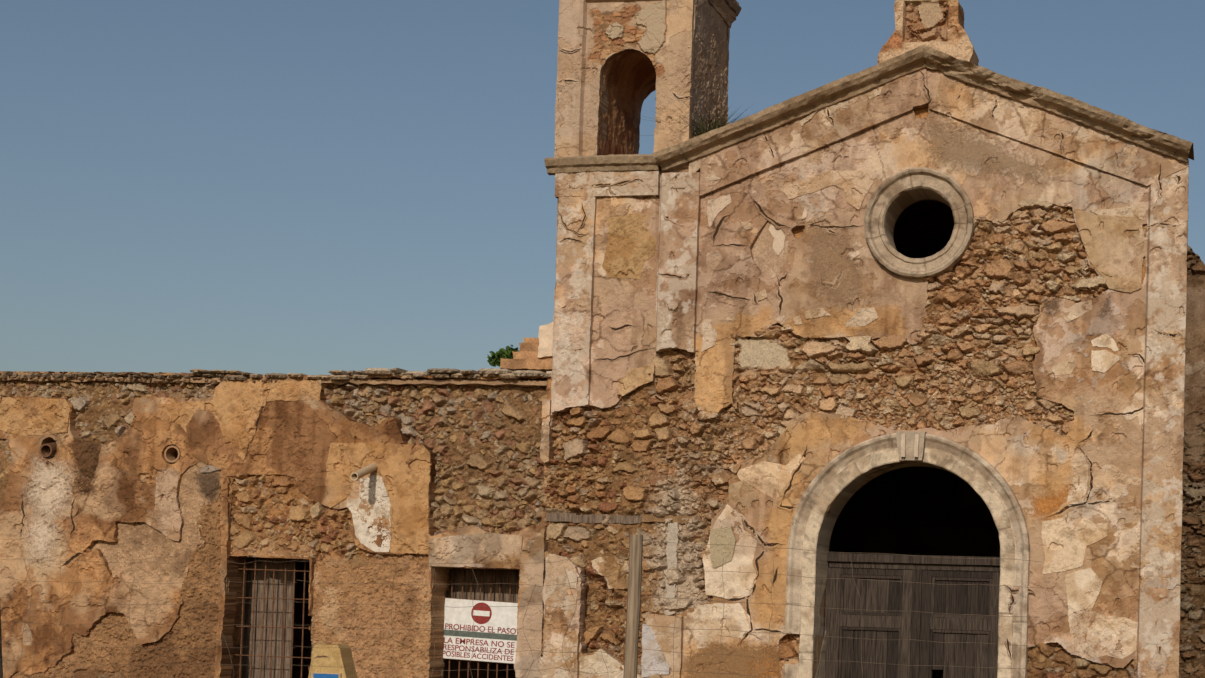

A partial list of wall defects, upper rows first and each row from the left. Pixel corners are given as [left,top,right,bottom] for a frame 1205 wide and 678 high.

crack [558,172,864,290]
crack [658,271,787,315]
spalling [0,169,1167,678]